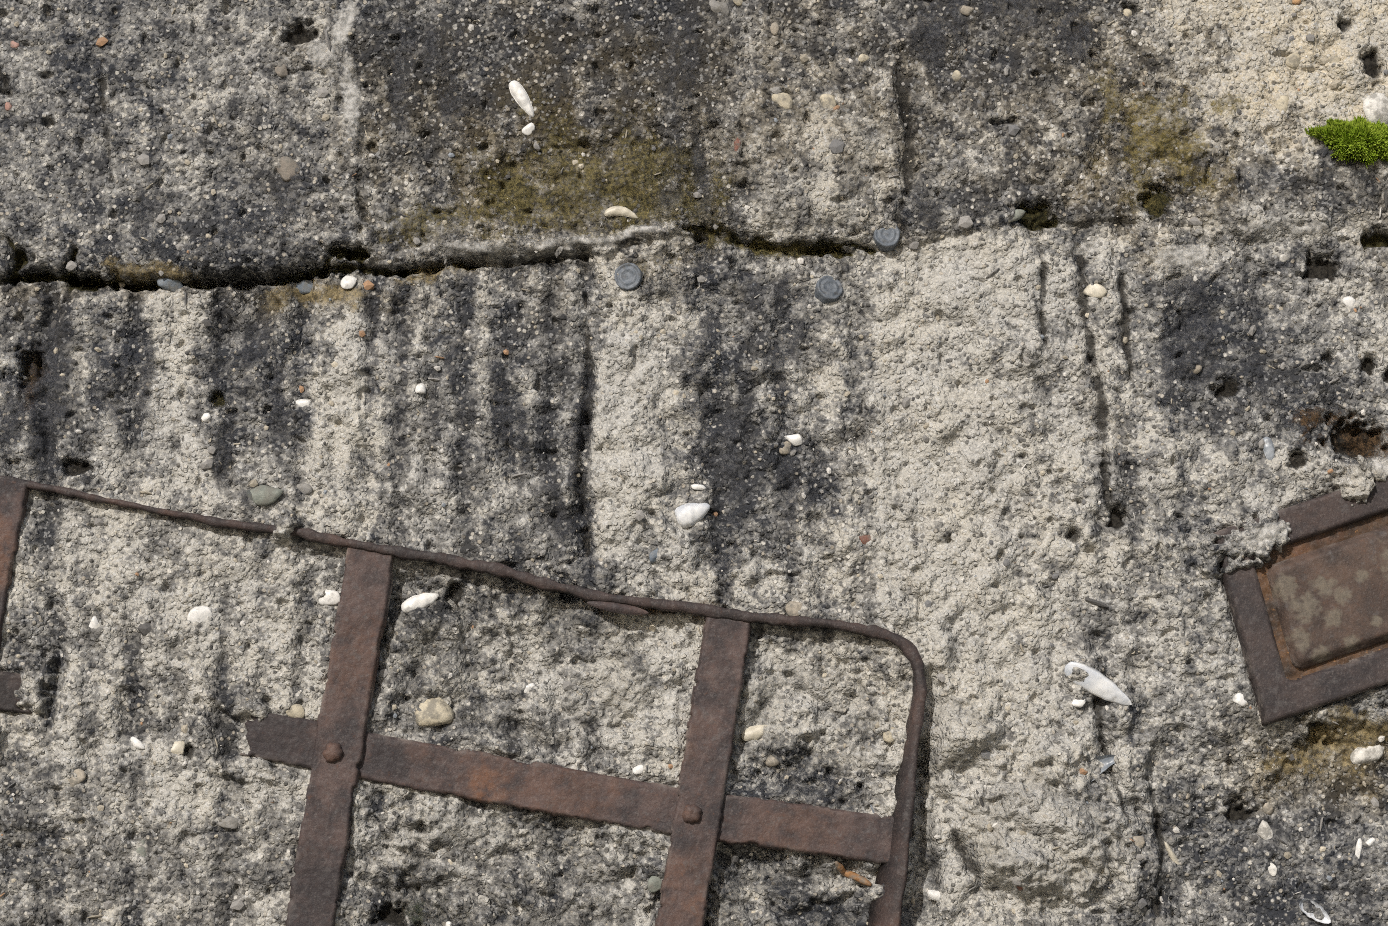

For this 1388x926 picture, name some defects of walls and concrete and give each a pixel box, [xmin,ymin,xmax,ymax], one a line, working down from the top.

crack [260,126,482,285]
damp [447,157,711,265]
damp [1280,220,1328,234]
crack [0,239,219,292]
damp [1152,246,1214,266]